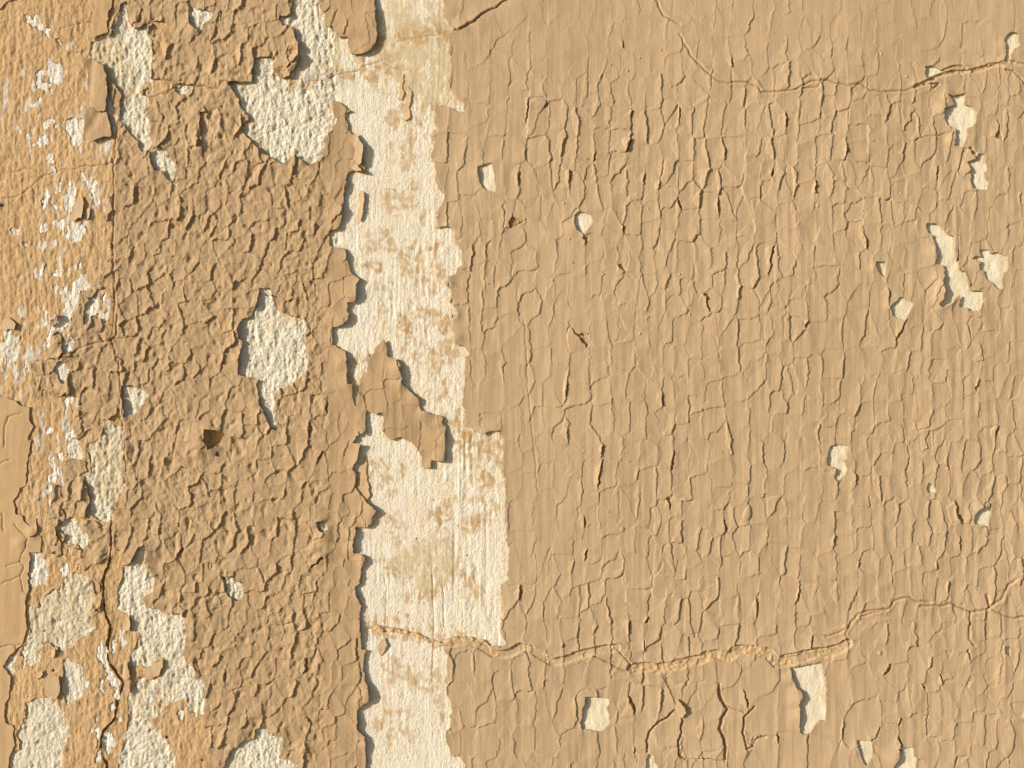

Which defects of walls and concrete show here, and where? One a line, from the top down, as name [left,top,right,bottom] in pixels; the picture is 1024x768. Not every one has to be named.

crack [1,125,123,424]
peeling [82,0,175,181]
crack [403,0,507,41]
crack [509,174,524,227]
crack [656,0,1024,126]
peeling [929,92,987,190]
peeling [918,223,1008,322]
peeling [221,0,509,768]
peeling [4,572,96,768]
crack [92,450,127,768]
crack [366,566,1024,760]
peeling [778,662,826,734]